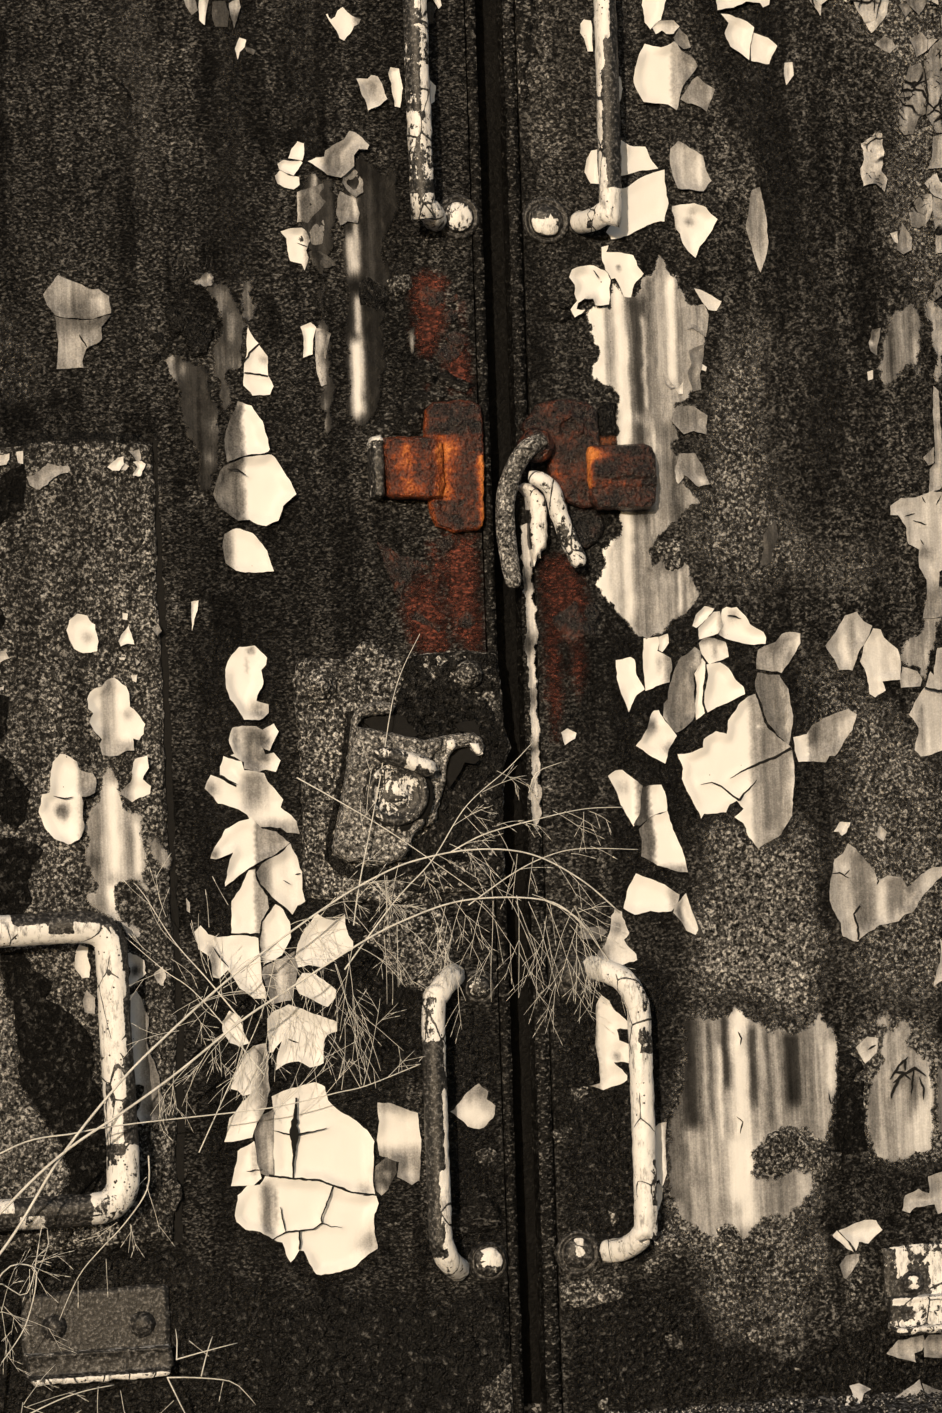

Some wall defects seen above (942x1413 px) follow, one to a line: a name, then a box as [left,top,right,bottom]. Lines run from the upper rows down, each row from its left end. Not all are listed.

peeling [166,272,296,573]
rust [359,272,476,437]
rust [597,402,617,445]
rust [377,533,479,653]
rust [544,557,601,717]
peeling [616,606,857,849]
crack [701,747,792,801]
peeling [825,612,942,757]
peeling [0,613,172,1126]
peeling [186,646,421,1275]
crack [269,1098,377,1250]
peeling [655,1007,942,1240]